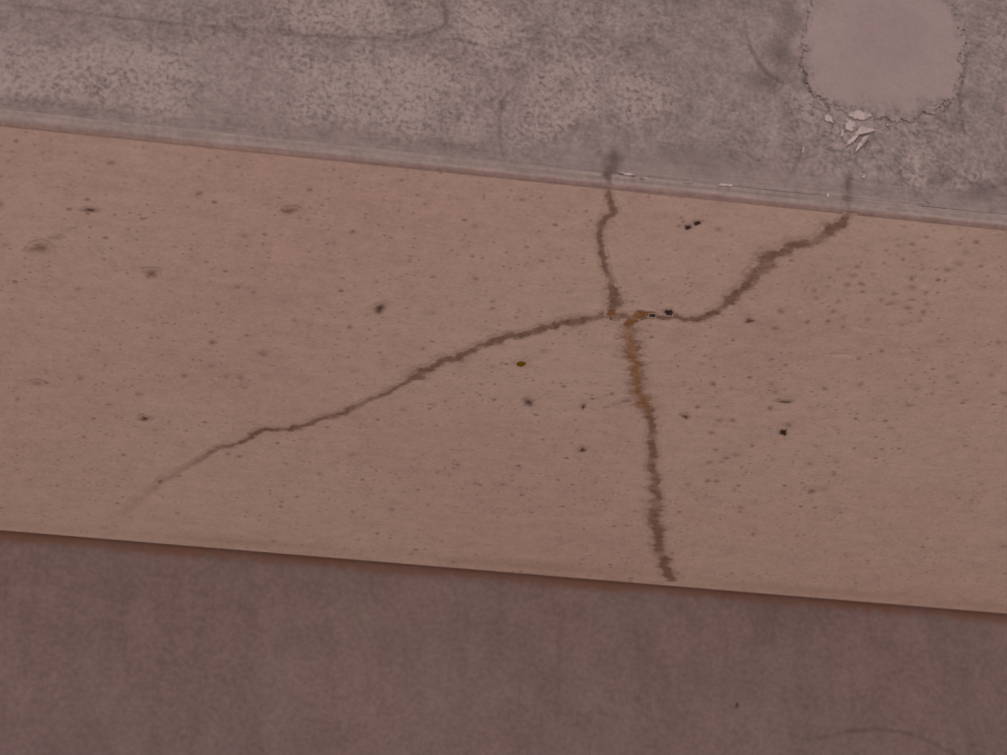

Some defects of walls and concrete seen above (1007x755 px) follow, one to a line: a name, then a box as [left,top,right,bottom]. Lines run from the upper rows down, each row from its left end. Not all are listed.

crack [109,189,857,582]